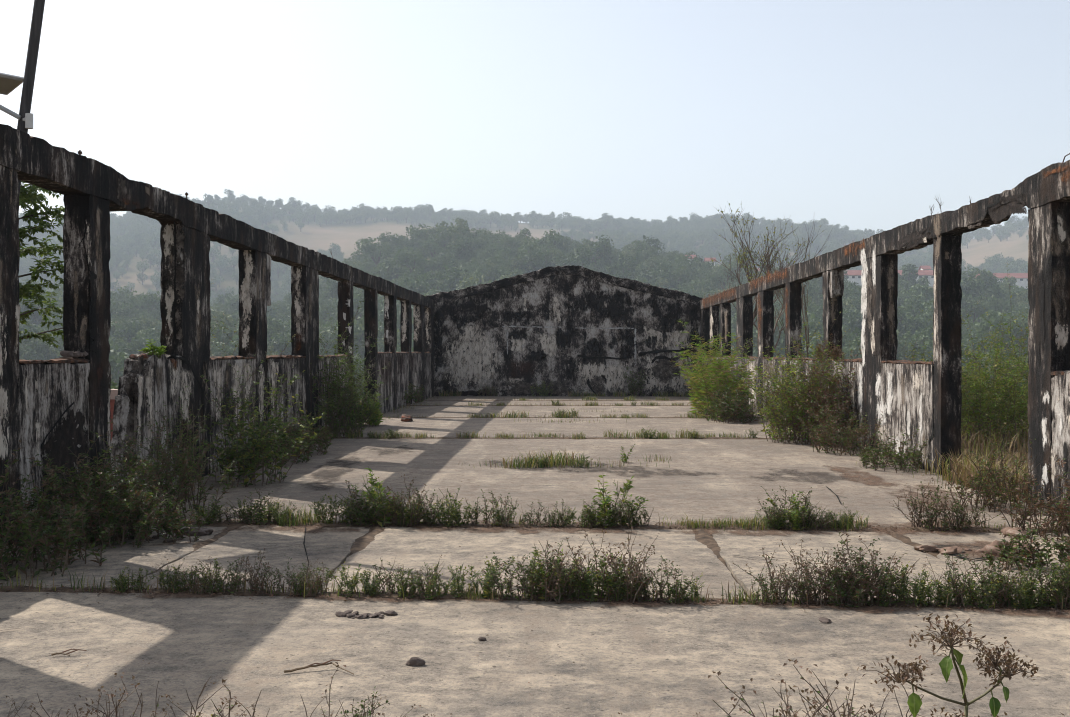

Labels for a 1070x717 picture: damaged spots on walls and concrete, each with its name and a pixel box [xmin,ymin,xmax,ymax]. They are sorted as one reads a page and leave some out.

flaking render [1050,215,1070,256]
flaking render [0,259,9,460]
flaking render [107,222,193,471]
flaking render [213,361,279,429]
flaking render [241,250,253,348]
water stain [434,293,494,372]
water stain [506,296,550,340]
water stain [555,290,699,380]
flaking render [851,248,928,457]
flaking render [1052,270,1069,350]
spalling [35,402,94,490]
flaking render [1041,415,1070,487]